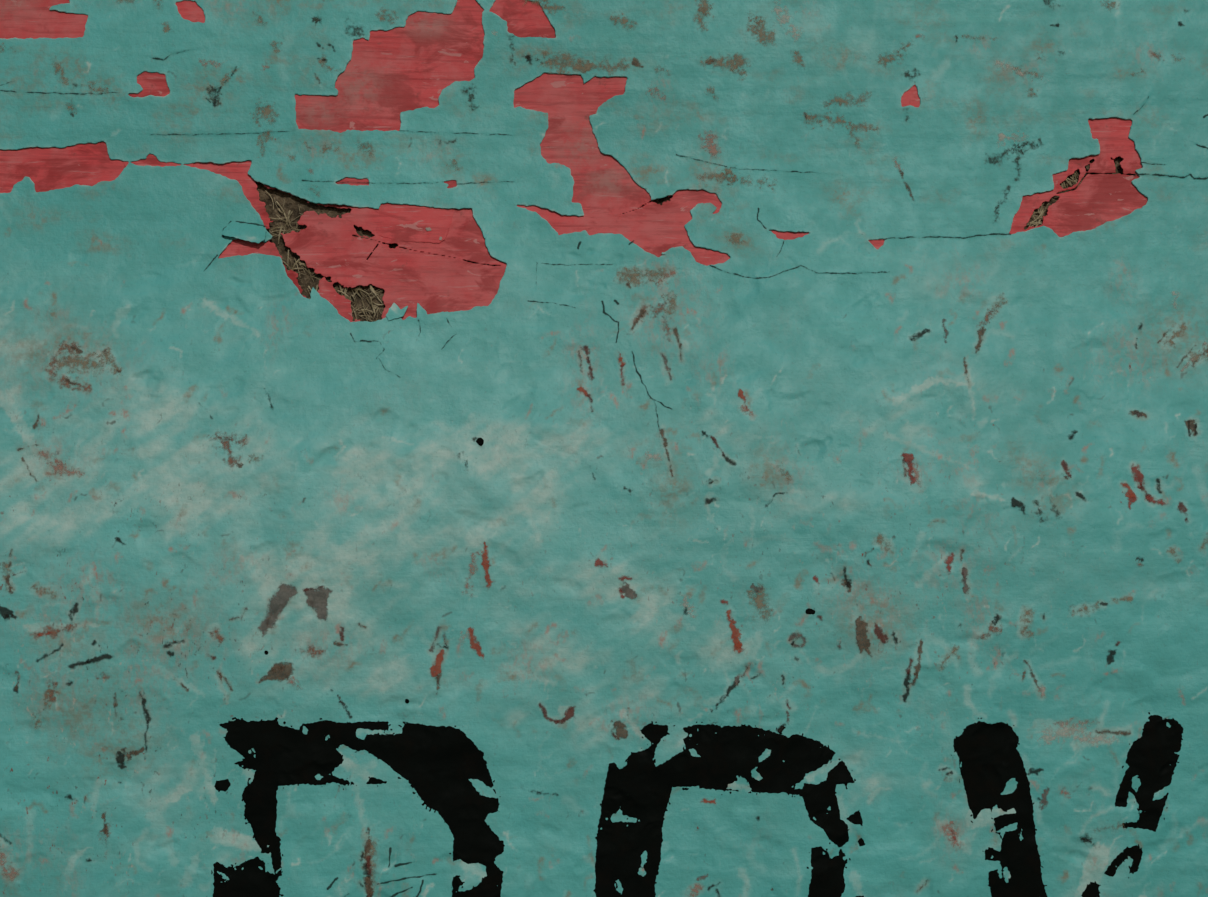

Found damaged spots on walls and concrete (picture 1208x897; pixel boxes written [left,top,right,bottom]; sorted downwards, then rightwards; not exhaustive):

peeling [0,0,88,39]
peeling [295,0,556,133]
peeling [0,142,507,322]
peeling [513,73,730,266]
crack [710,208,887,279]
crack [878,232,1011,240]
peeling [1009,118,1148,237]
crack [1134,114,1208,180]